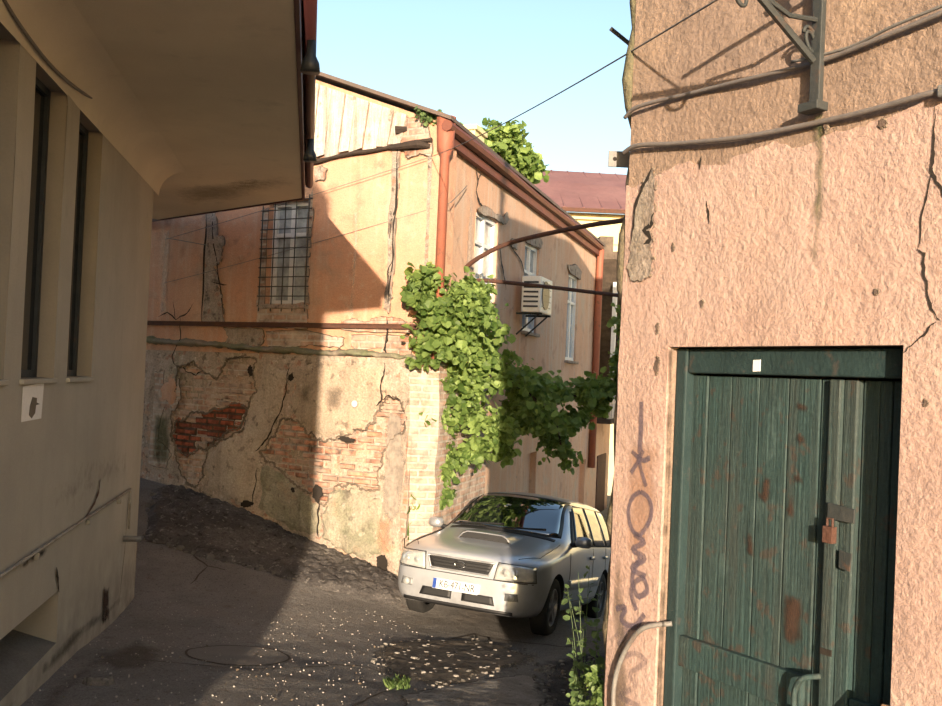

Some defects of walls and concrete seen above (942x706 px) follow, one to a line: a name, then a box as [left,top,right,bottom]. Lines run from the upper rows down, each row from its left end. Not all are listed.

spalling [148,117,434,488]
crack [376,149,399,406]
spalling [627,167,657,283]
crack [903,107,942,353]
crack [252,367,293,502]
spalling [259,396,412,550]
crack [297,664,391,706]